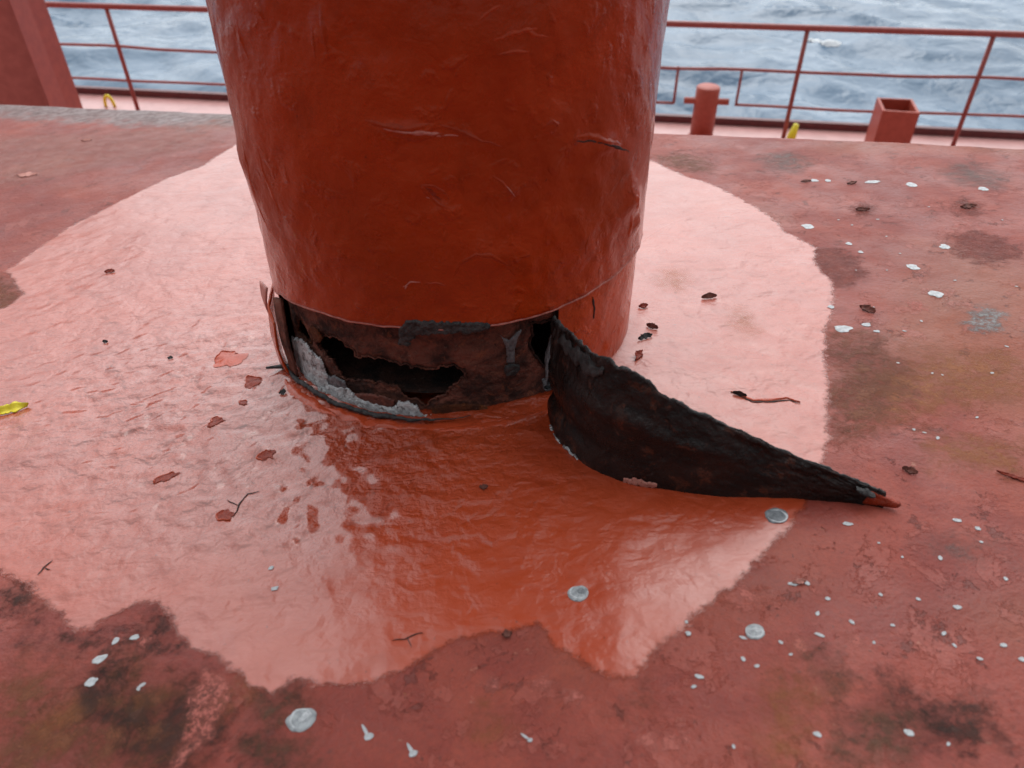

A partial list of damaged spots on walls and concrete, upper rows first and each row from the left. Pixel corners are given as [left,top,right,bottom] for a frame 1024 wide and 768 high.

peeling [635,323,658,361]
rust [266,364,488,422]
peeling [623,478,657,488]